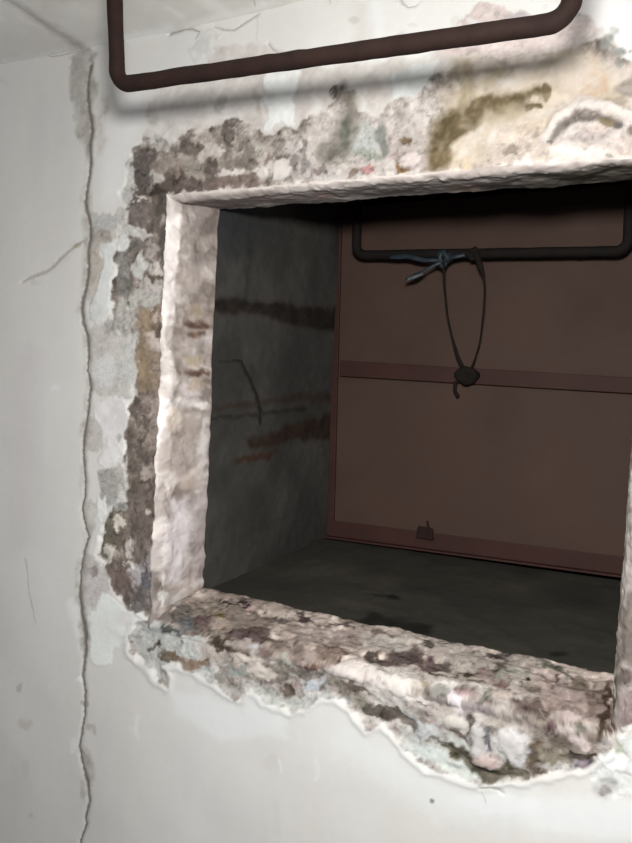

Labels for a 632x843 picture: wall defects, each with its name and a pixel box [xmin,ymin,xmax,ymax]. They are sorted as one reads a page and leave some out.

crack [169,0,279,53]
crack [394,0,419,8]
peeling [456,0,536,27]
peeling [437,11,600,62]
damp [141,24,632,174]
crack [0,0,99,843]
spalling [86,66,632,801]